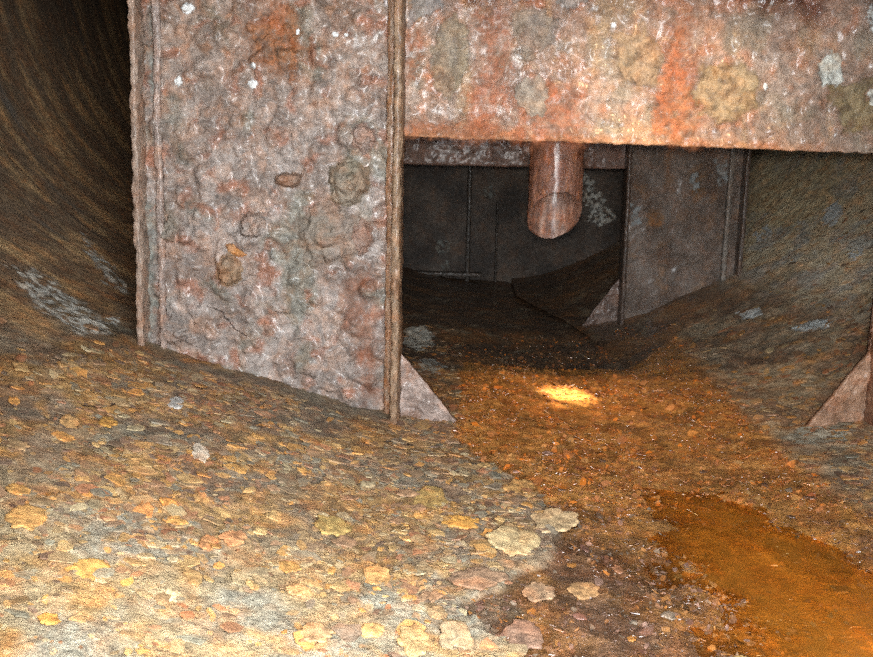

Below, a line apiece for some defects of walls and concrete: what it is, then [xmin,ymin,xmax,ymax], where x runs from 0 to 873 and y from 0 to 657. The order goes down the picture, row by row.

corrosion [245,5,298,80]
corrosion [408,0,581,138]
corrosion [653,28,696,140]
corrosion [275,171,302,188]
corrosion [289,122,379,269]
corrosion [0,208,873,657]